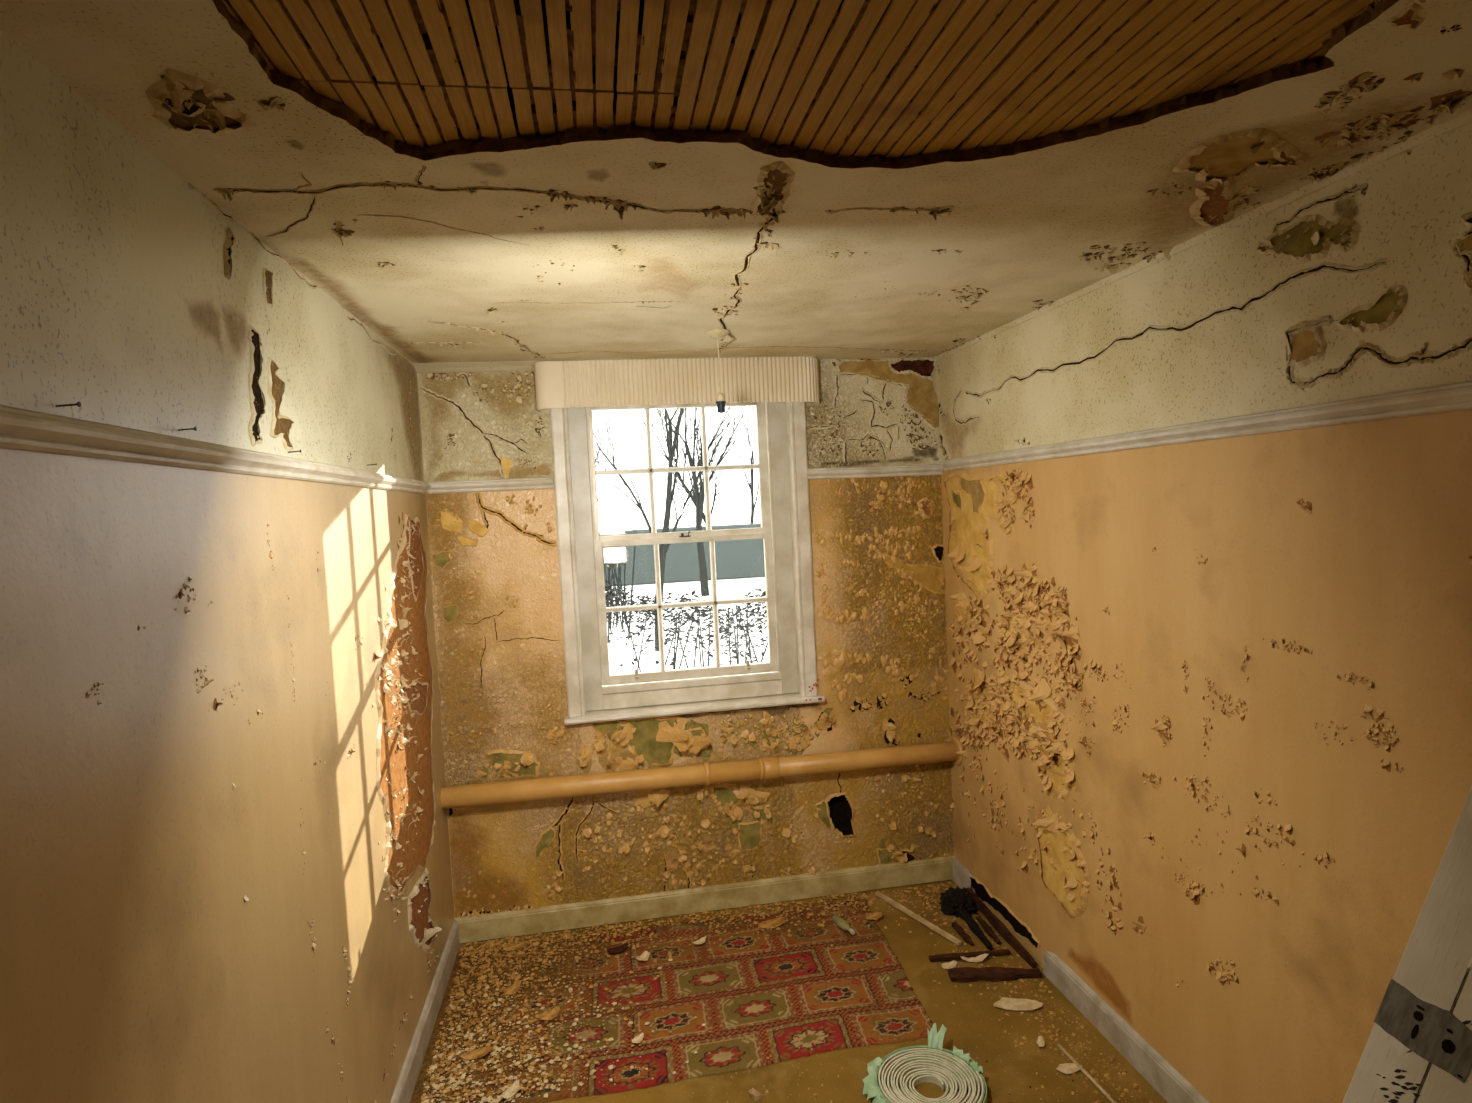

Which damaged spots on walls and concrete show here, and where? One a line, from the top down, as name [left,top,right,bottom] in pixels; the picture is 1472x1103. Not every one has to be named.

peeling [1386,0,1430,30]
peeling [145,68,285,135]
peeling [648,161,666,170]
peeling [1146,69,1472,229]
peeling [1257,214,1360,264]
crack [1450,227,1472,294]
crack [188,165,1387,547]
peeling [1285,285,1408,391]
crack [1283,315,1472,389]
peeling [1296,497,1312,515]
peeling [1149,715,1173,747]
peeling [1206,957,1239,986]